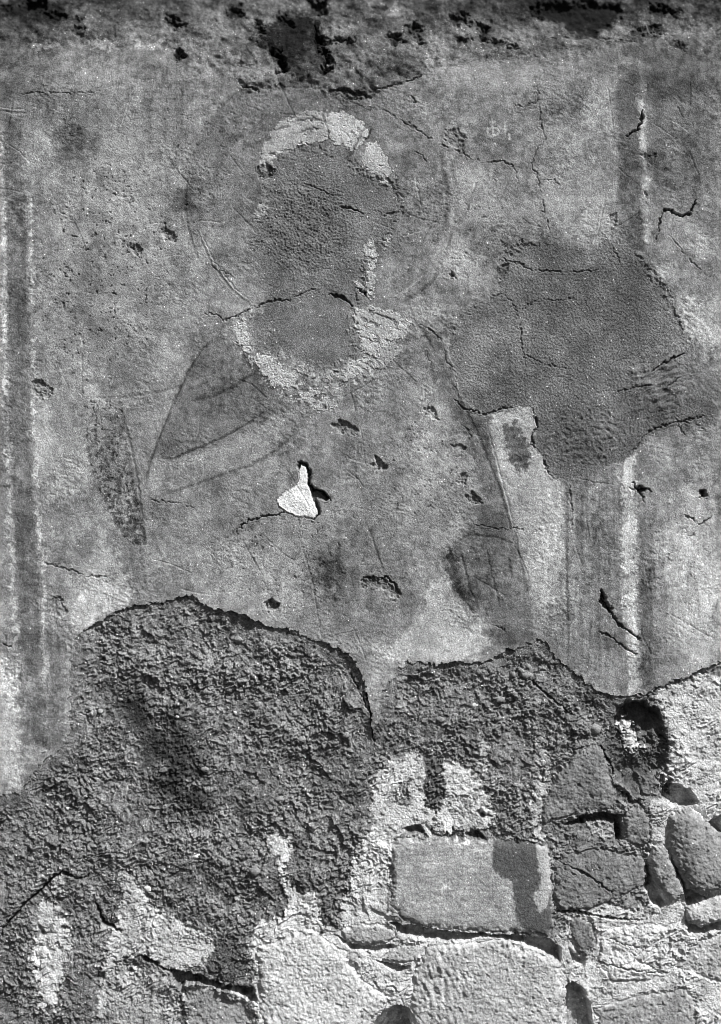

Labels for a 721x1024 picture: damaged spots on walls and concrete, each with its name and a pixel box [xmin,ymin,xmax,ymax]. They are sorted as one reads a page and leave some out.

spalling [0,0,721,186]
crack [625,109,645,138]
crack [642,190,704,272]
crack [204,287,367,339]
crack [373,74,623,528]
crack [617,353,687,394]
crack [233,511,288,535]
spalling [277,460,332,522]
peeling [36,546,69,698]
crack [598,589,644,657]
spalling [0,594,664,1024]
crack [0,869,124,939]